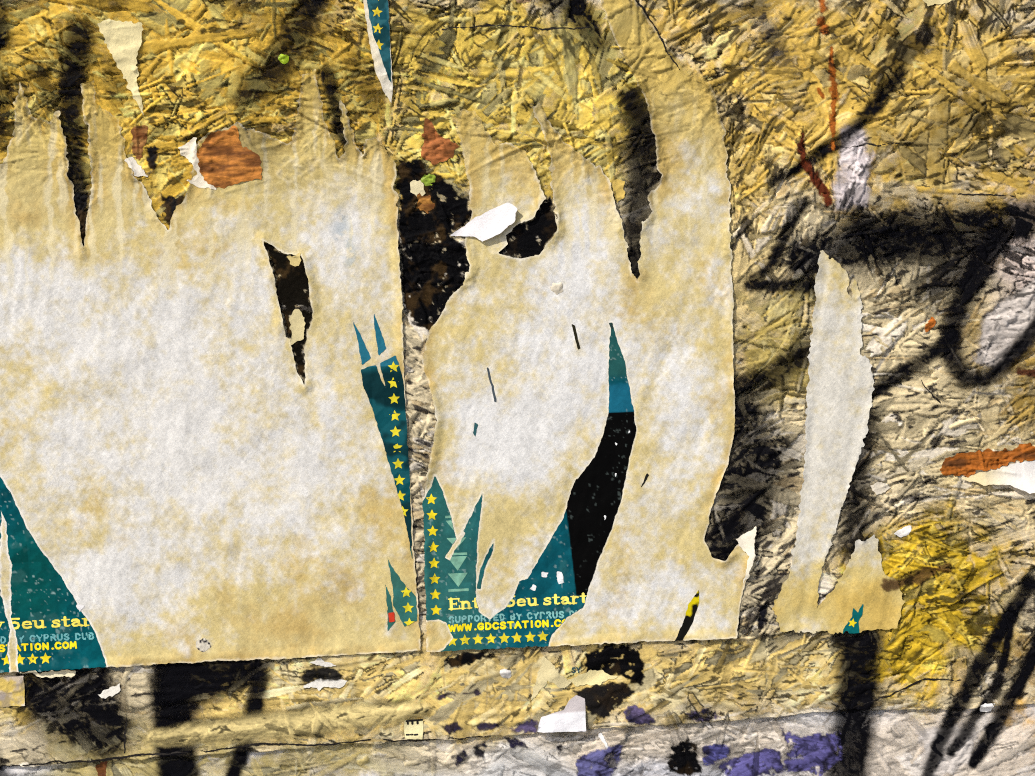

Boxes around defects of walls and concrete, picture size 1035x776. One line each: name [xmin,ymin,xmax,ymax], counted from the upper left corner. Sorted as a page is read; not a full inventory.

peeling [131,125,148,161]
peeling [196,126,262,189]
peeling [421,118,460,165]
peeling [416,193,435,214]